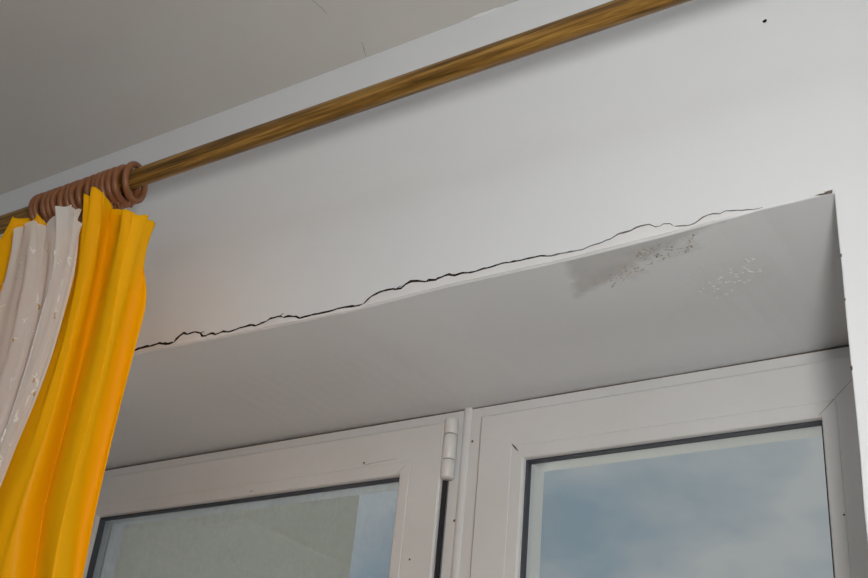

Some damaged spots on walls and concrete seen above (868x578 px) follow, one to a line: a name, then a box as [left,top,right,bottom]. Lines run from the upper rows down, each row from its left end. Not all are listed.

crack [135,207,763,351]